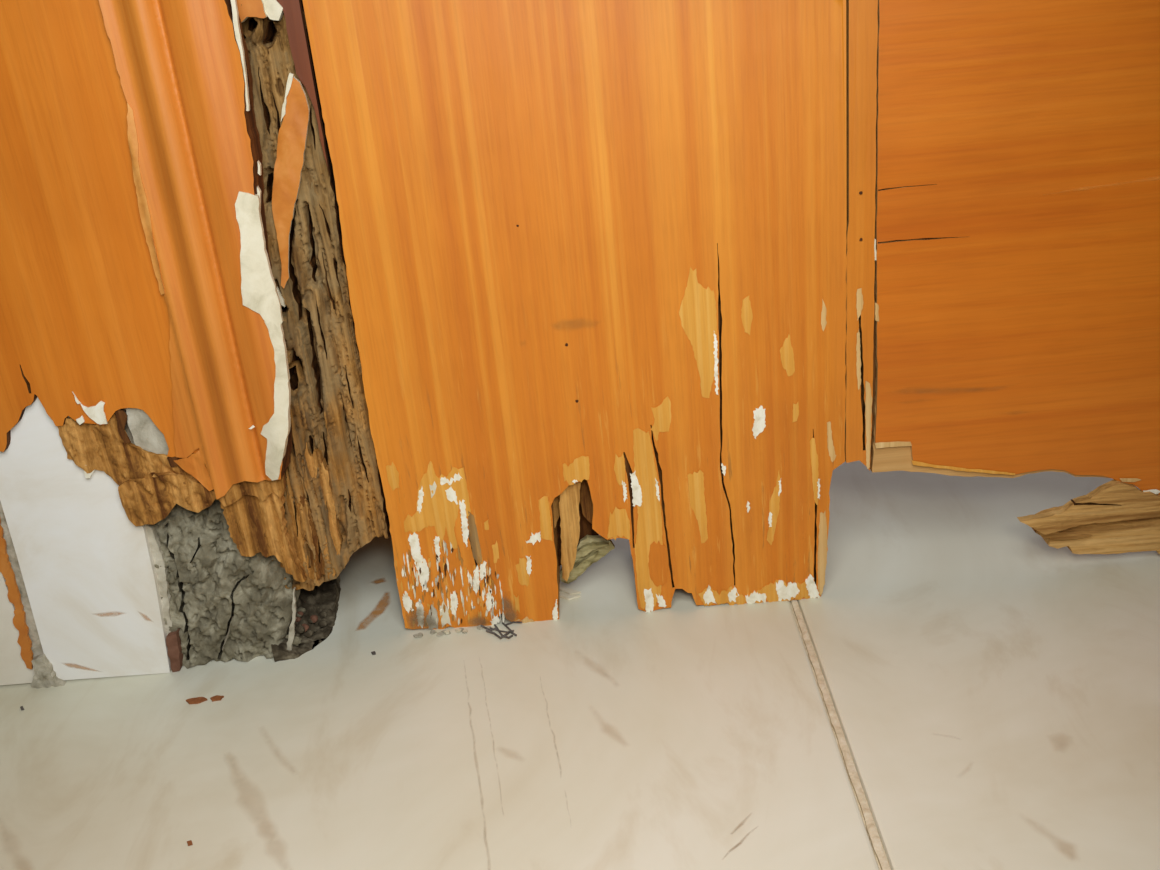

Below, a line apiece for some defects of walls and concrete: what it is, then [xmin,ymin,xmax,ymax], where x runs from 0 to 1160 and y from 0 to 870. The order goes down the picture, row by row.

peeling [231,0,250,111]
peeling [72,391,108,425]
flaking render [126,408,169,455]
crack [165,523,201,660]
crack [218,575,249,660]
peeling [235,73,310,481]
peeling [395,461,553,629]
peeling [607,396,671,613]
crack [624,425,675,587]
peeling [679,267,719,398]
crack [717,243,735,586]
peeling [698,421,836,606]